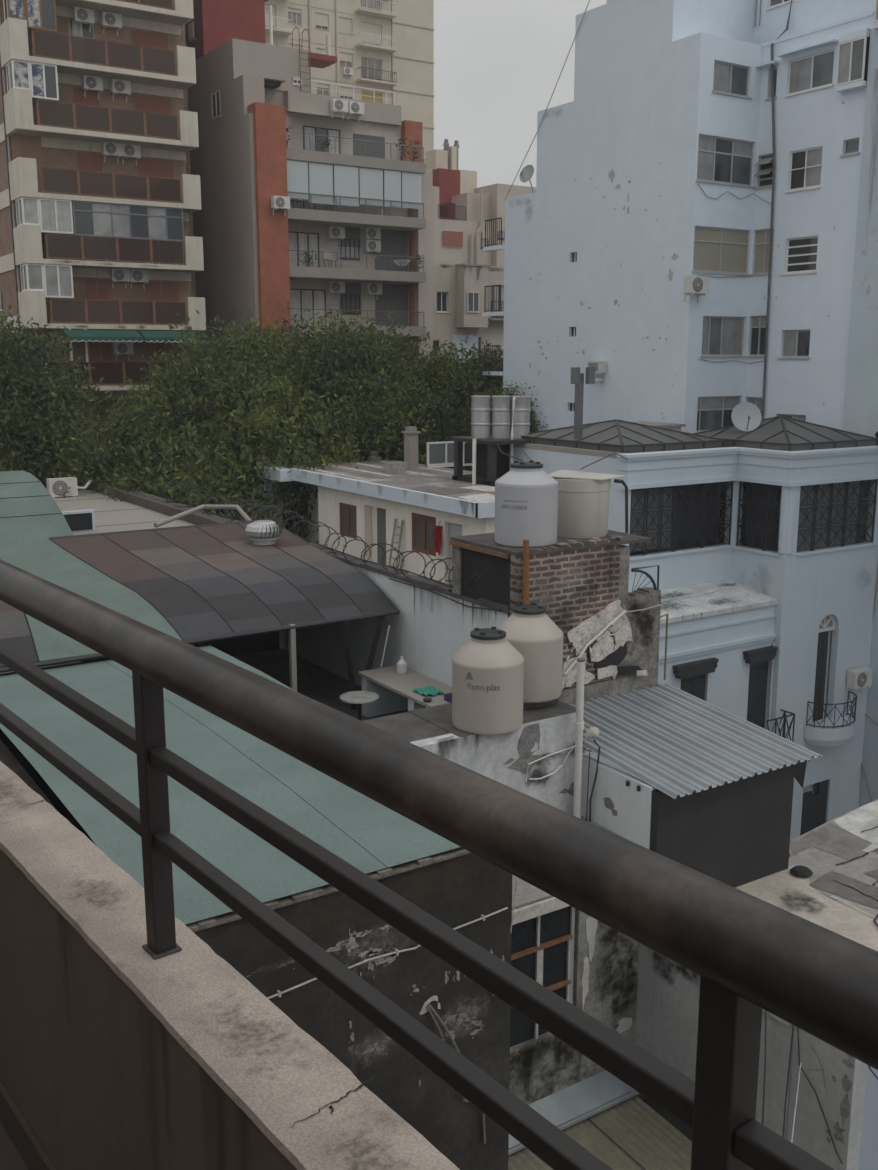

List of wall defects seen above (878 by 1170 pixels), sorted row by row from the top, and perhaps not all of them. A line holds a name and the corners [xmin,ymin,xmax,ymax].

peeling [562,600,633,690]
spalling [504,723,540,774]
peeling [326,924,400,978]
water stain [600,928,636,1026]
peeling [348,1021,391,1055]
peeling [410,984,484,1039]
crack [289,1076,374,1128]